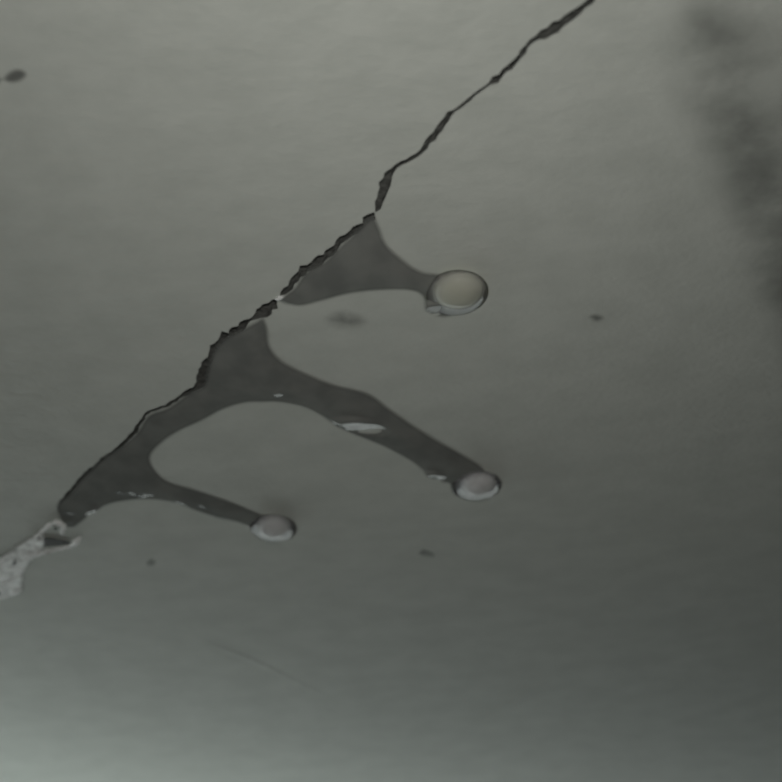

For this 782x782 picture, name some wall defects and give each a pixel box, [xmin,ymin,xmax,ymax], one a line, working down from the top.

crack [58,0,595,512]
leakage [275,219,448,316]
leakage [0,320,483,600]